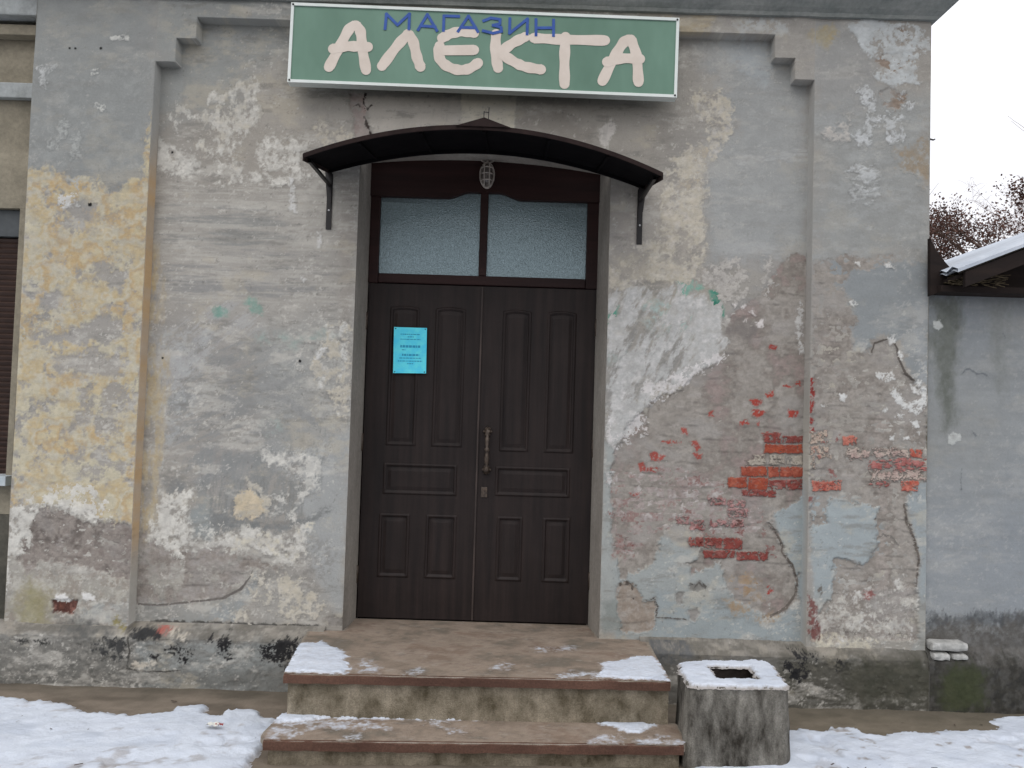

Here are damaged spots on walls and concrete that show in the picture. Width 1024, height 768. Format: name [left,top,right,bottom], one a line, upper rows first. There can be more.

peeling [819,19,930,148]
peeling [6,70,370,628]
spalling [605,86,927,649]
crack [870,338,916,382]
damp [15,609,237,667]
crack [126,569,320,674]
damp [257,634,304,670]
damp [781,643,841,686]
damp [925,602,1024,714]